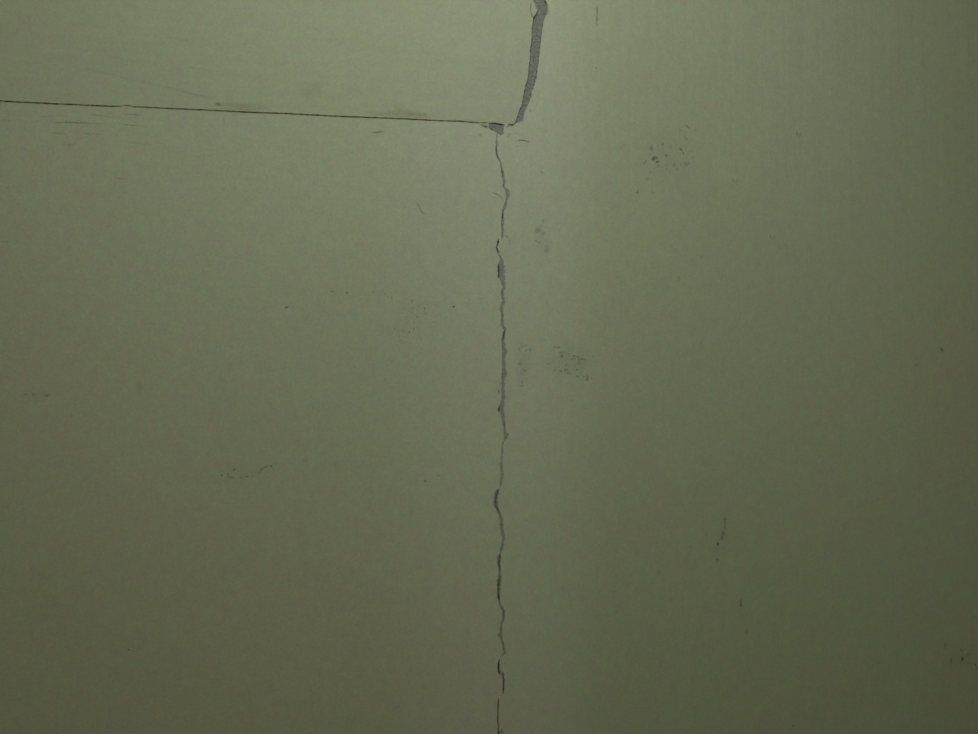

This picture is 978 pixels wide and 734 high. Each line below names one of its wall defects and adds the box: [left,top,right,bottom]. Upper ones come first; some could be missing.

crack [0,0,547,733]